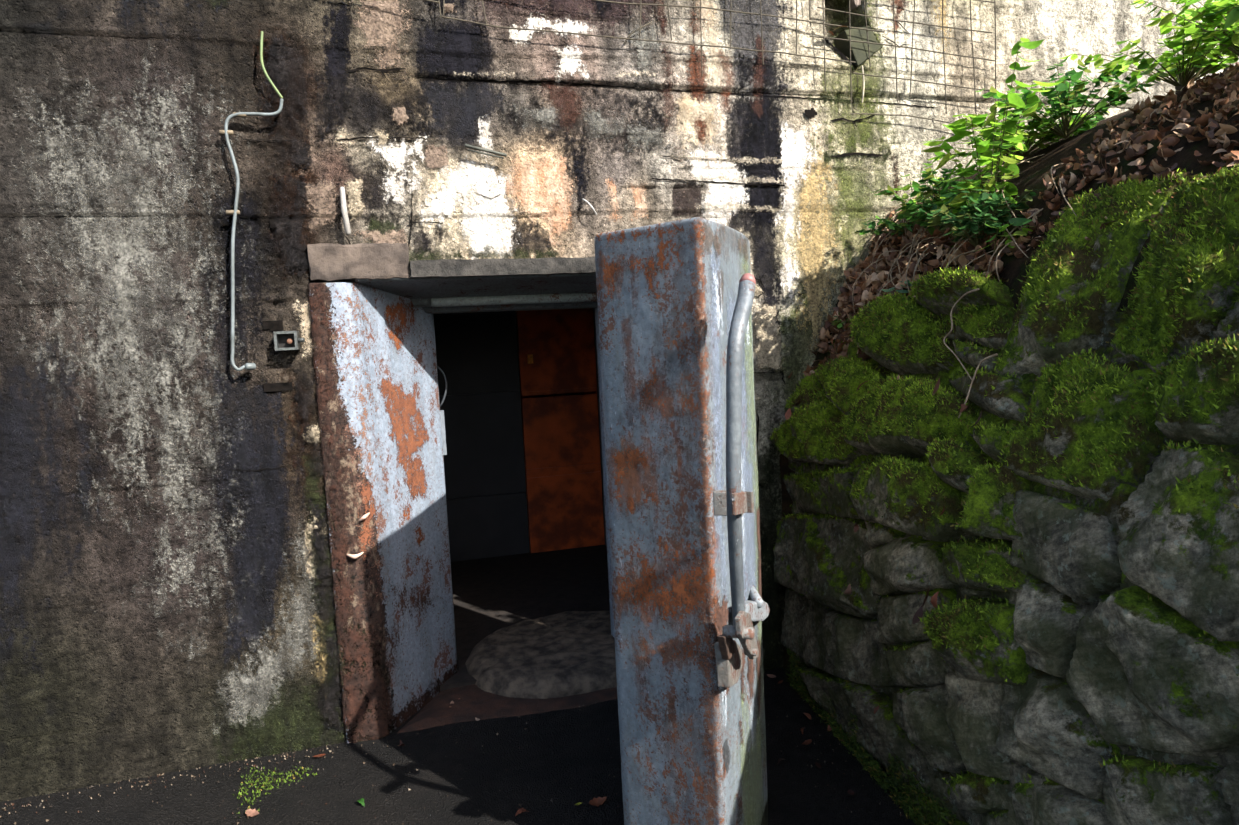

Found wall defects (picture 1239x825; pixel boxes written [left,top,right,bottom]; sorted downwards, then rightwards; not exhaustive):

damp [0,0,345,763]
corrosion [254,30,458,743]
damp [305,0,842,352]
corrosion [596,217,761,825]